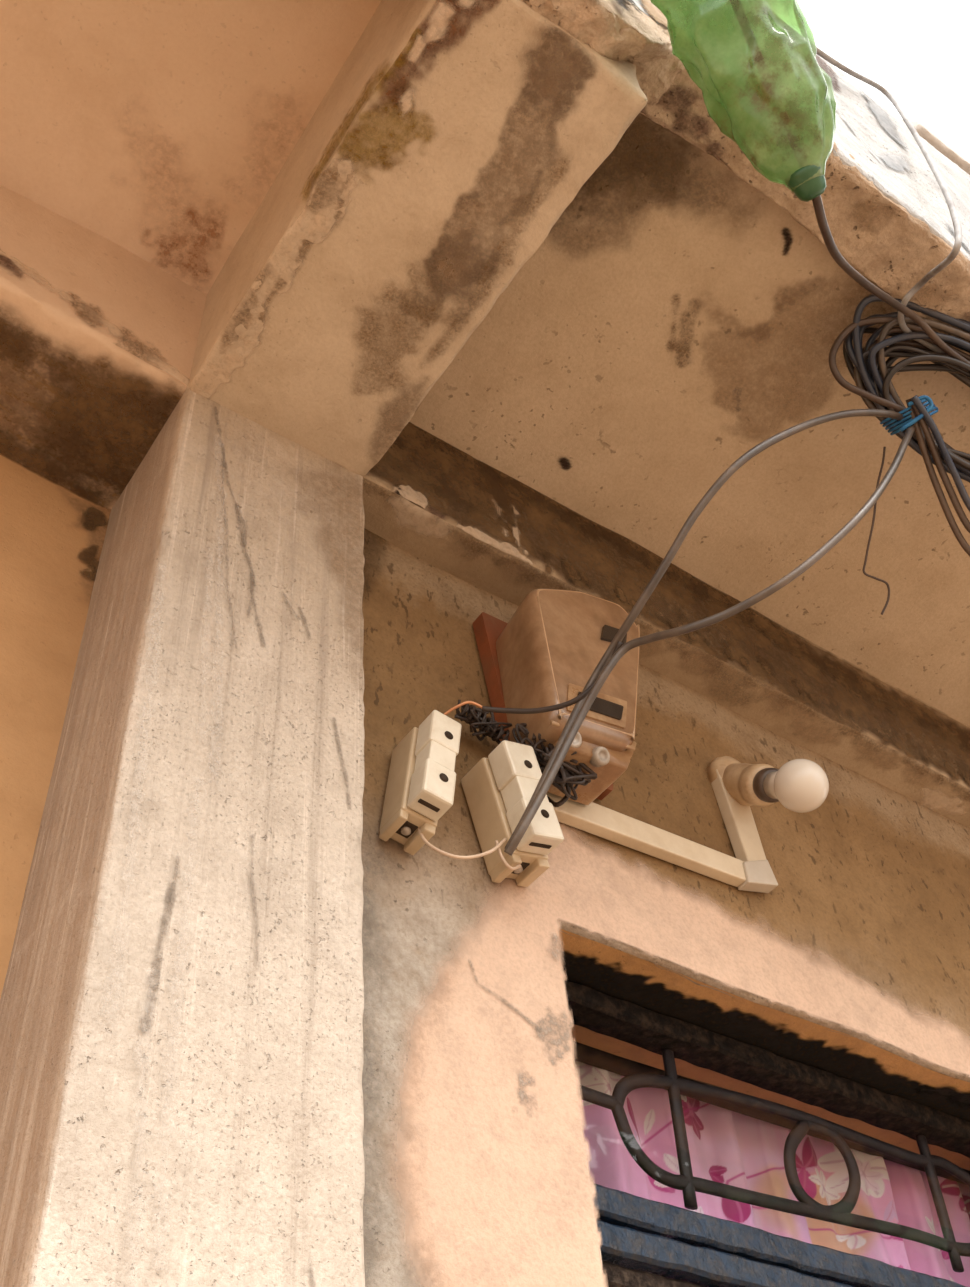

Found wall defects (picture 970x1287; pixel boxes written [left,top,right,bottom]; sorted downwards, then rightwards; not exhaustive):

damp [303,0,499,196]
peeling [0,159,355,398]
damp [0,310,181,507]
damp [345,29,970,812]